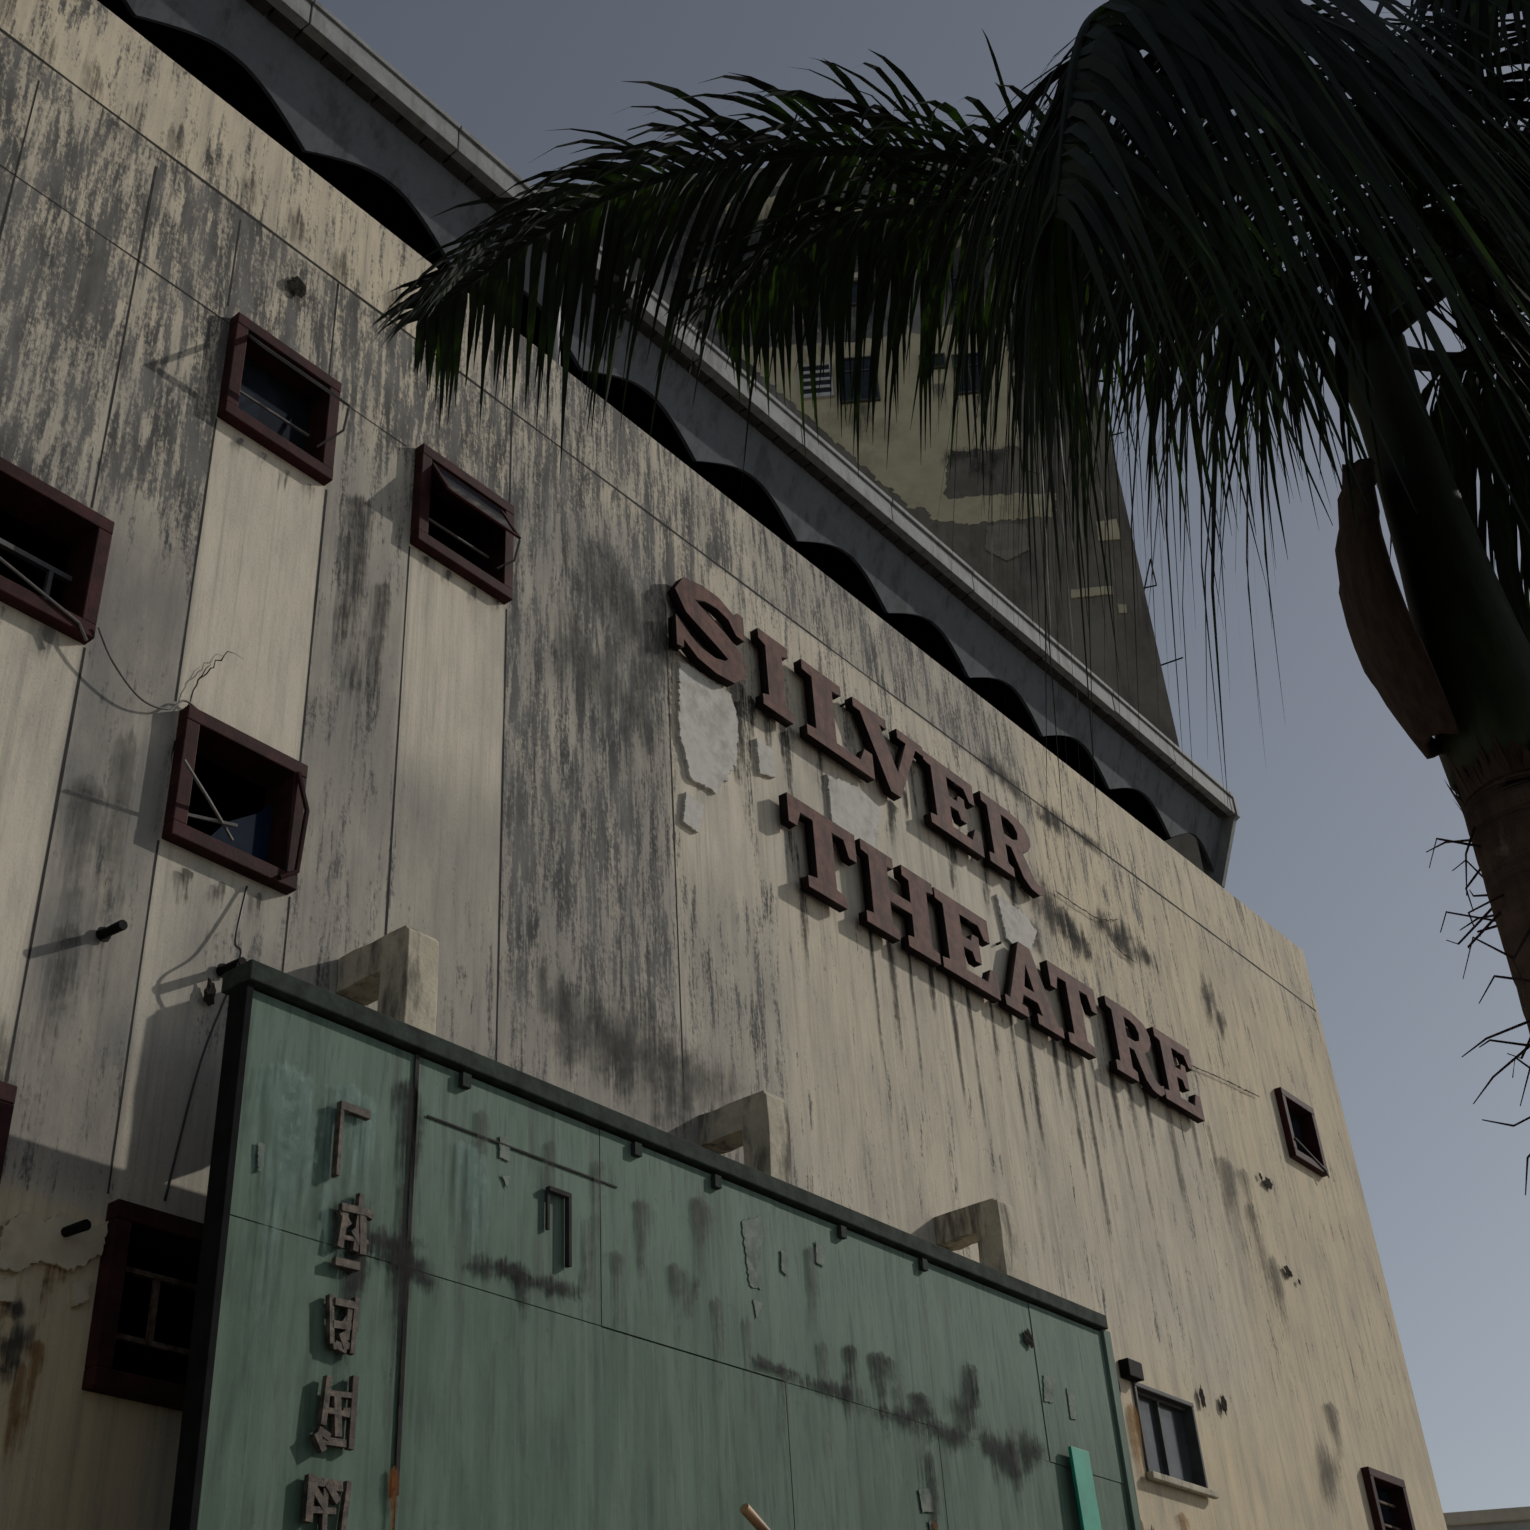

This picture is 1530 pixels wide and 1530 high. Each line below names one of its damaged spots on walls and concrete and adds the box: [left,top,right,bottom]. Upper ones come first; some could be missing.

peeling [758,196,776,221]
peeling [728,306,1057,562]
leakage [341,495,390,715]
peeling [675,661,775,834]
peeling [824,774,881,848]
leakage [869,930,985,1116]
leakage [989,1002,1044,1135]
leakage [1010,877,1157,966]
leakage [1051,1039,1185,1237]
leakage [1201,975,1227,1038]
leakage [1,1301,35,1375]
leakage [746,1317,1044,1530]